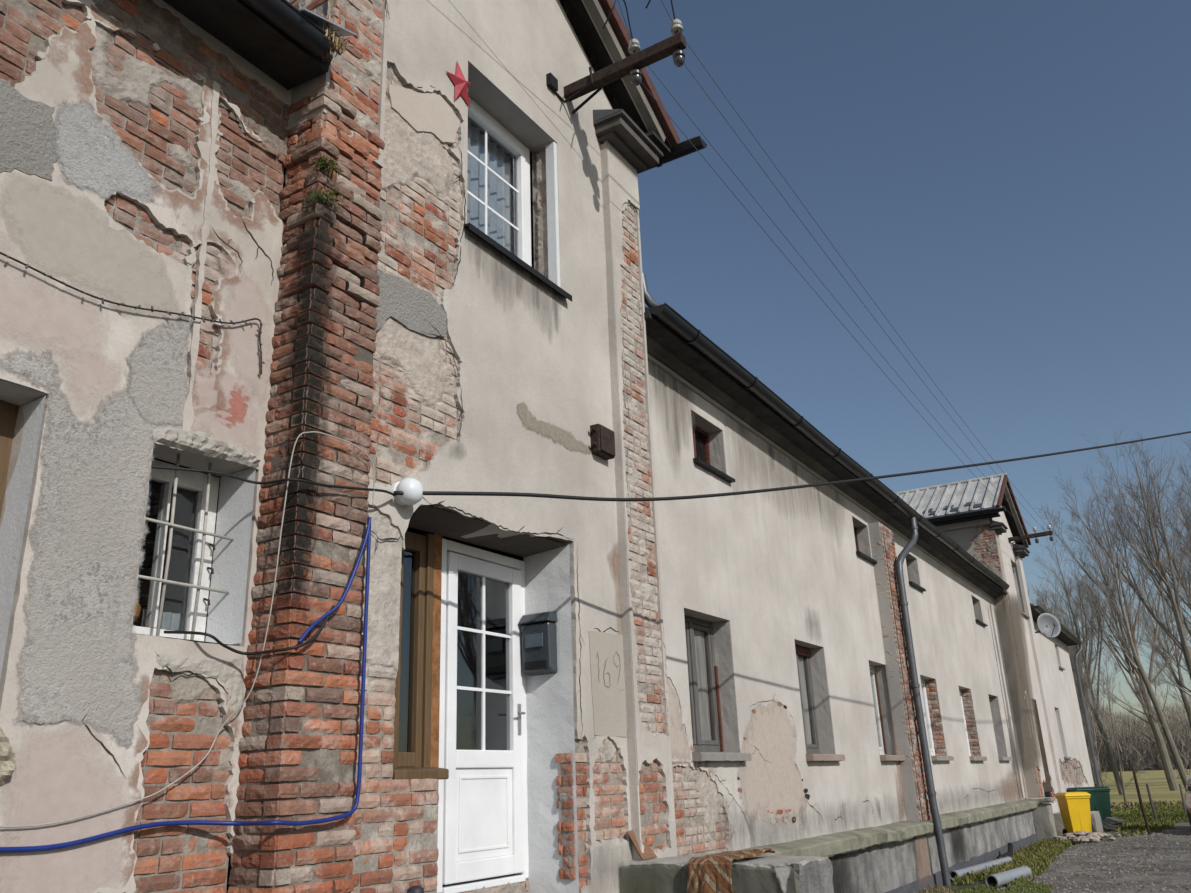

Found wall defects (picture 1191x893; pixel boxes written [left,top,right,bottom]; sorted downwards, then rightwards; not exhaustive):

flaking render [0,0,289,217]
crack [213,216,274,285]
flaking render [287,0,463,486]
flaking render [620,196,665,736]
flaking render [965,524,1002,573]
flaking render [0,654,245,893]
flaking render [575,738,626,888]
flaking render [639,759,727,857]
peeling [738,701,810,824]
flaking render [1033,759,1088,800]